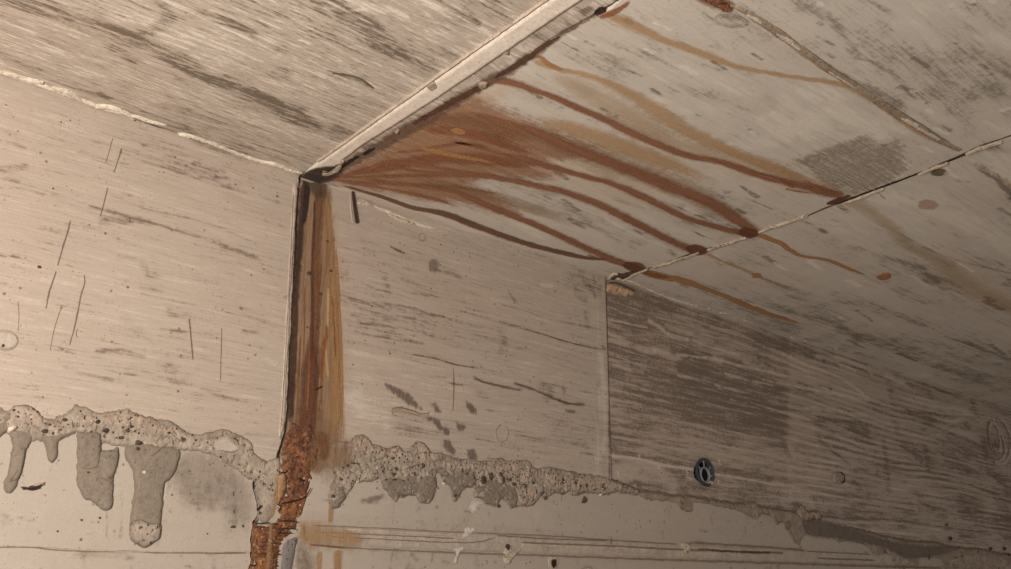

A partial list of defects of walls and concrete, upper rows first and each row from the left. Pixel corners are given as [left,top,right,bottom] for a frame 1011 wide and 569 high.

crack [594,0,618,15]
crack [321,148,376,173]
corrosion [248,2,862,569]
damp [803,513,958,558]